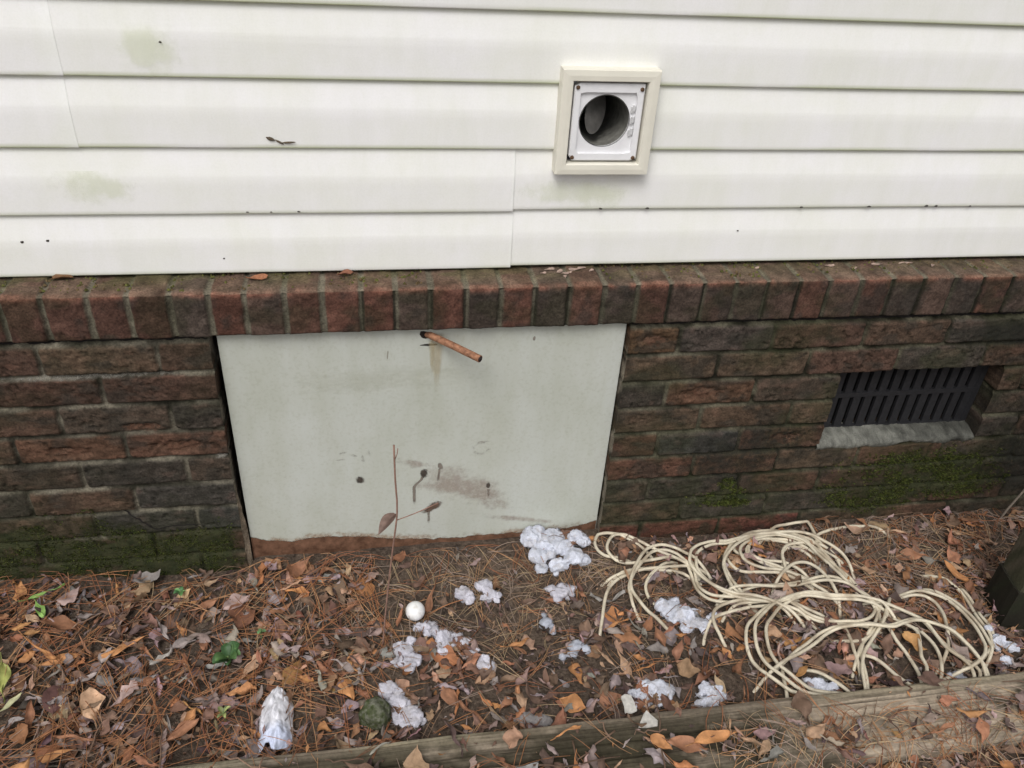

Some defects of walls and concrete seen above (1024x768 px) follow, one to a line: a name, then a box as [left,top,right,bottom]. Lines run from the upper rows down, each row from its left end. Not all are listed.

rust [560,520,596,530]
rust [251,531,522,558]